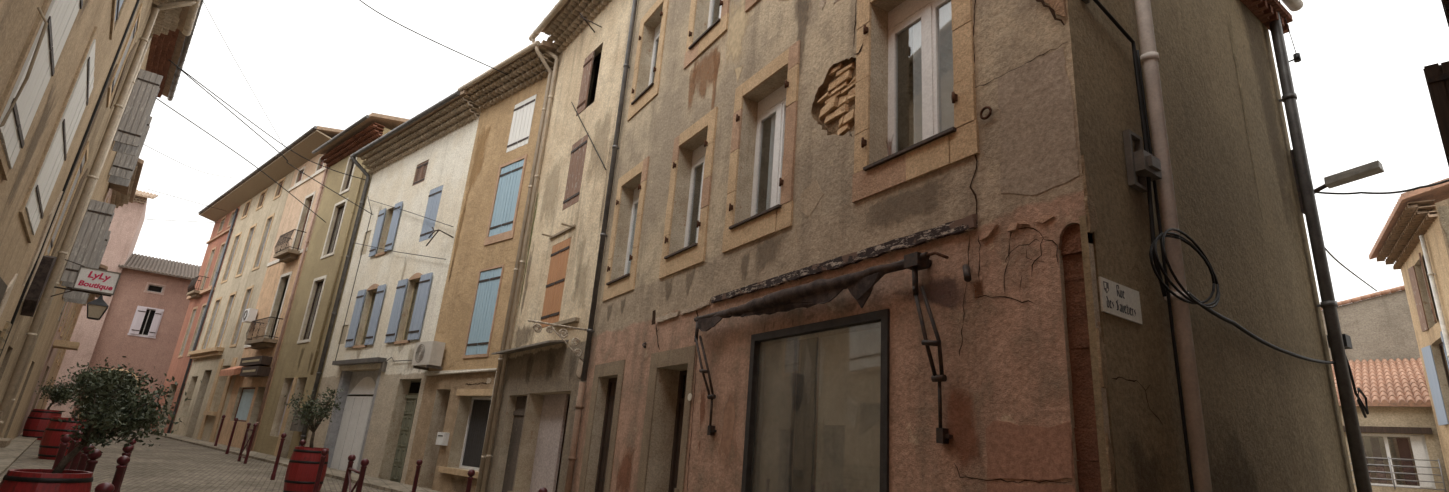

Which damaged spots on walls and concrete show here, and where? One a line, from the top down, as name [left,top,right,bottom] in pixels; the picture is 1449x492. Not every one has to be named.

flaking render [811,44,863,136]
flaking render [1036,0,1068,25]
crack [959,154,1059,356]
flaking render [986,224,1102,492]